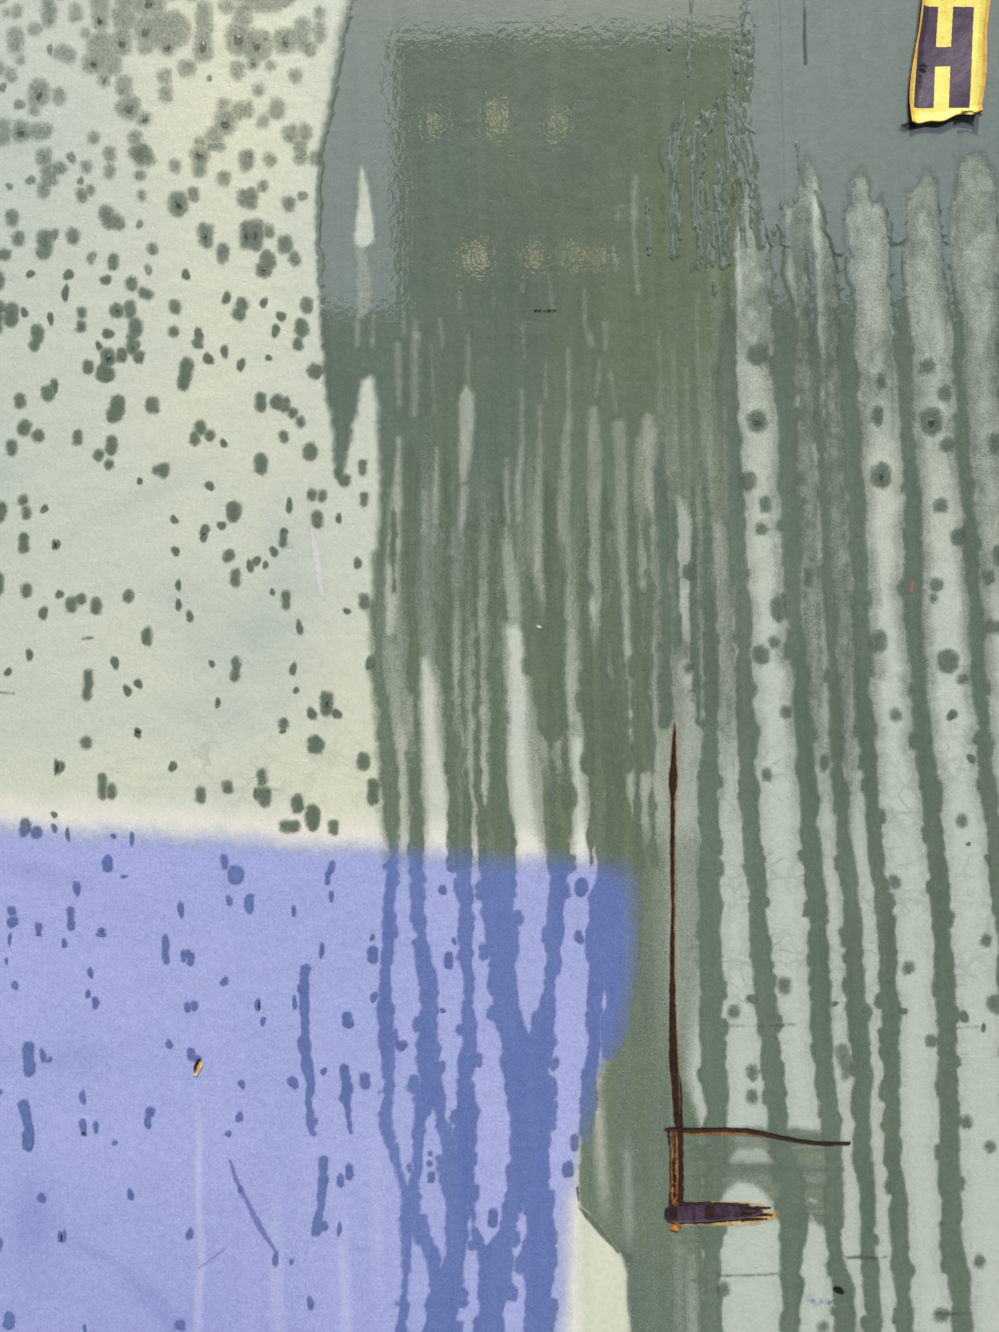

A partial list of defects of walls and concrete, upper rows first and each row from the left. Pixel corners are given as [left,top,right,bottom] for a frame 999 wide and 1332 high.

leakage [50,0,328,204]
leakage [195,179,302,279]
leakage [71,253,204,471]
leakage [5,377,59,456]
leakage [189,418,215,447]
leakage [254,392,307,443]
leakage [0,493,32,554]
leakage [221,549,241,589]
leakage [64,592,103,615]
leakage [277,0,999,1332]
leakage [19,817,43,839]
leakage [16,1098,35,1151]